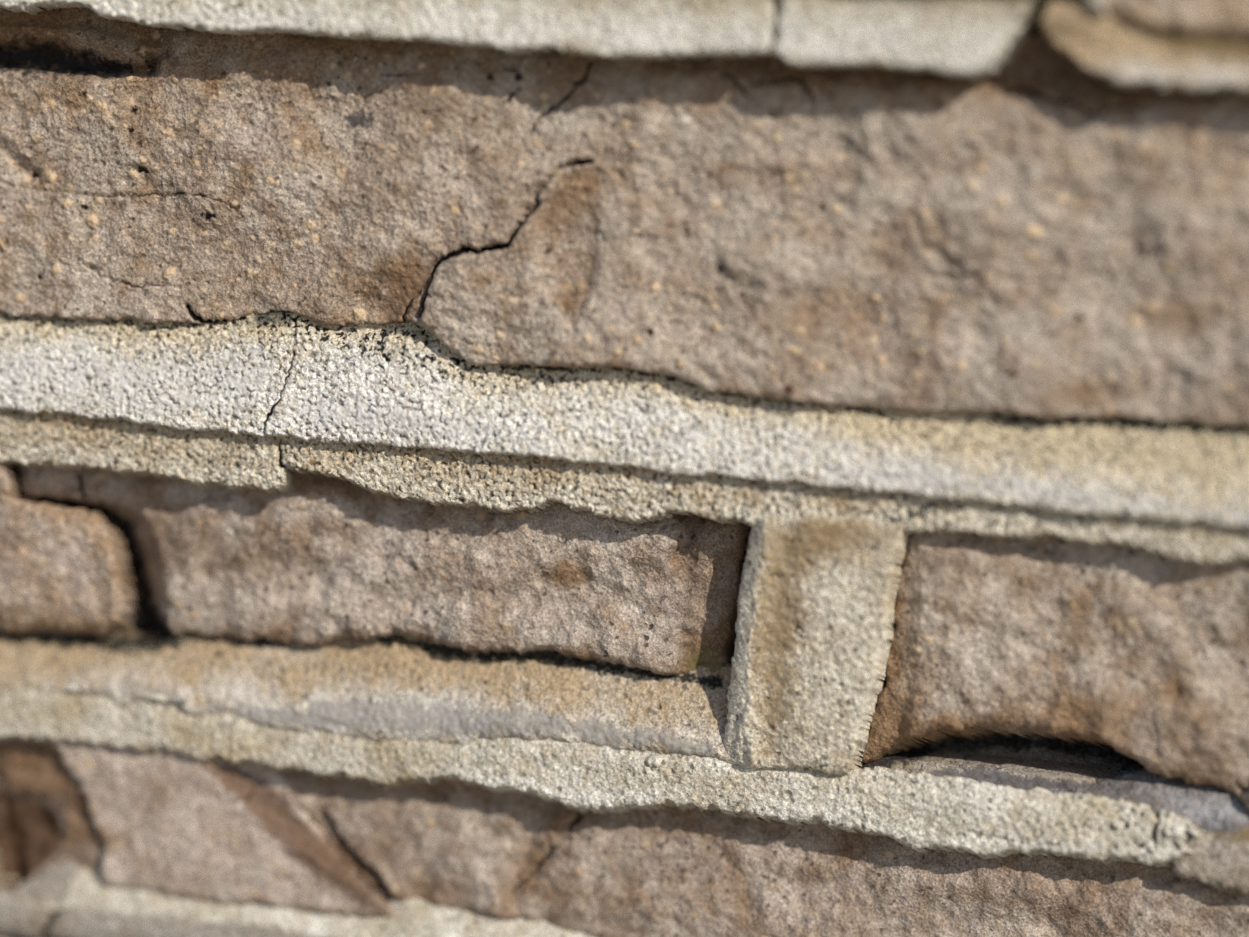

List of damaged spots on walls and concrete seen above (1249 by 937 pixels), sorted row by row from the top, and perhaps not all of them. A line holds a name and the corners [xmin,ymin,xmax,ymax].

crack [722,0,813,99]
crack [402,159,592,322]
crack [263,326,296,473]